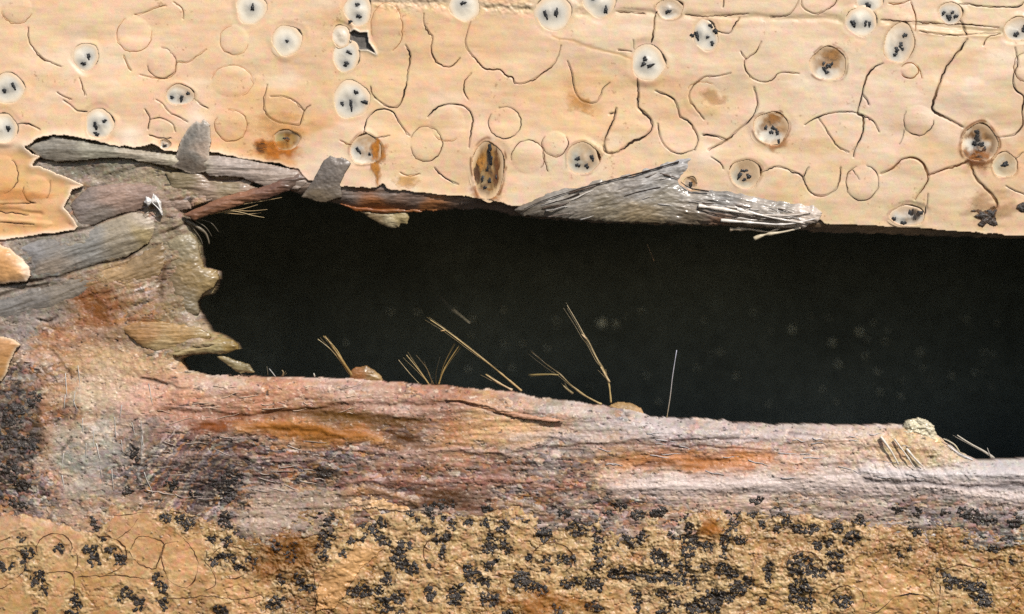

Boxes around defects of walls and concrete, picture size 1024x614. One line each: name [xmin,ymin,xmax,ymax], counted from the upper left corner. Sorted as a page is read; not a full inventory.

crack [1,11,58,66]
crack [117,2,308,142]
crack [342,0,799,184]
crack [762,0,1024,215]
crack [0,162,51,225]
corrosion [256,141,295,159]
corrosion [371,139,385,184]
peeling [359,211,409,228]
corrosion [474,149,500,199]
peeling [0,136,307,374]
peeling [0,337,21,381]
corrosion [198,421,227,431]